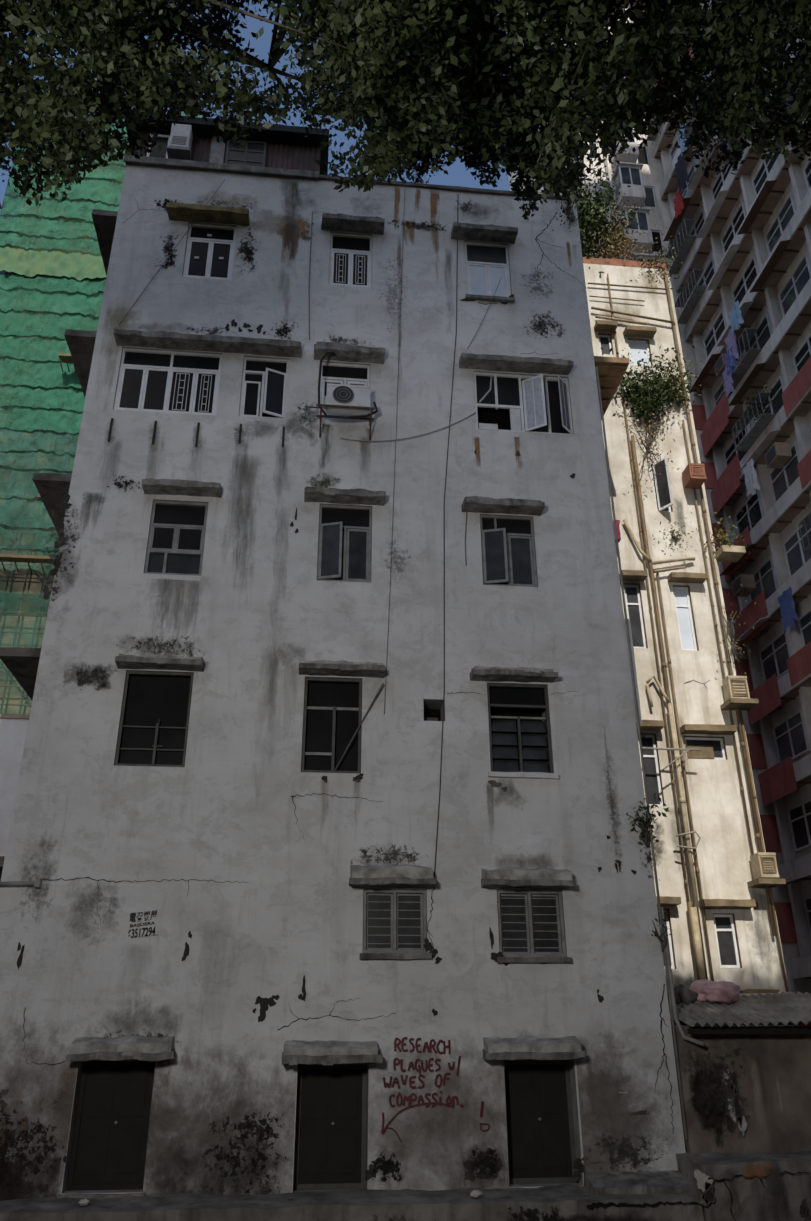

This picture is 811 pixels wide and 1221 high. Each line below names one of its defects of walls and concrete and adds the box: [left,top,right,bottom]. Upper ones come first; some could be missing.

rust [255,211,308,257]
rust [394,188,414,241]
rust [415,189,439,249]
water stain [40,495,92,601]
crack [291,793,383,839]
crack [42,877,248,925]
crack [277,998,395,1030]
water stain [690,1039,760,1135]
water stain [0,1102,69,1201]
water stain [165,1112,288,1195]